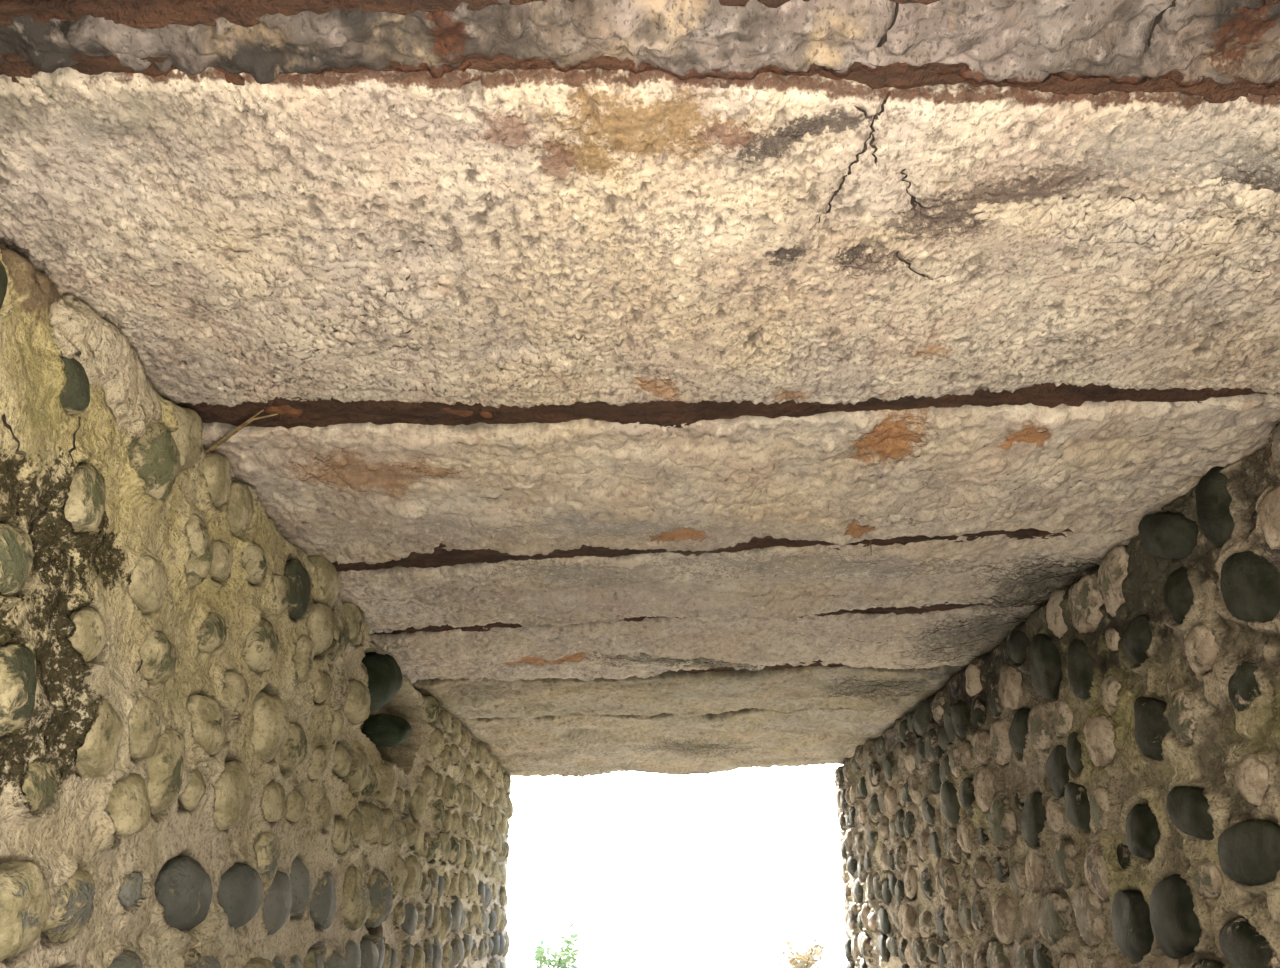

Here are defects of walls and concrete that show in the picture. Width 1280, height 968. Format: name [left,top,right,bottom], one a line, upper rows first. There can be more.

crack [815,93,946,225]
rust [851,410,927,465]
rust [997,423,1051,450]
rust [650,528,706,542]
rust [845,521,874,538]